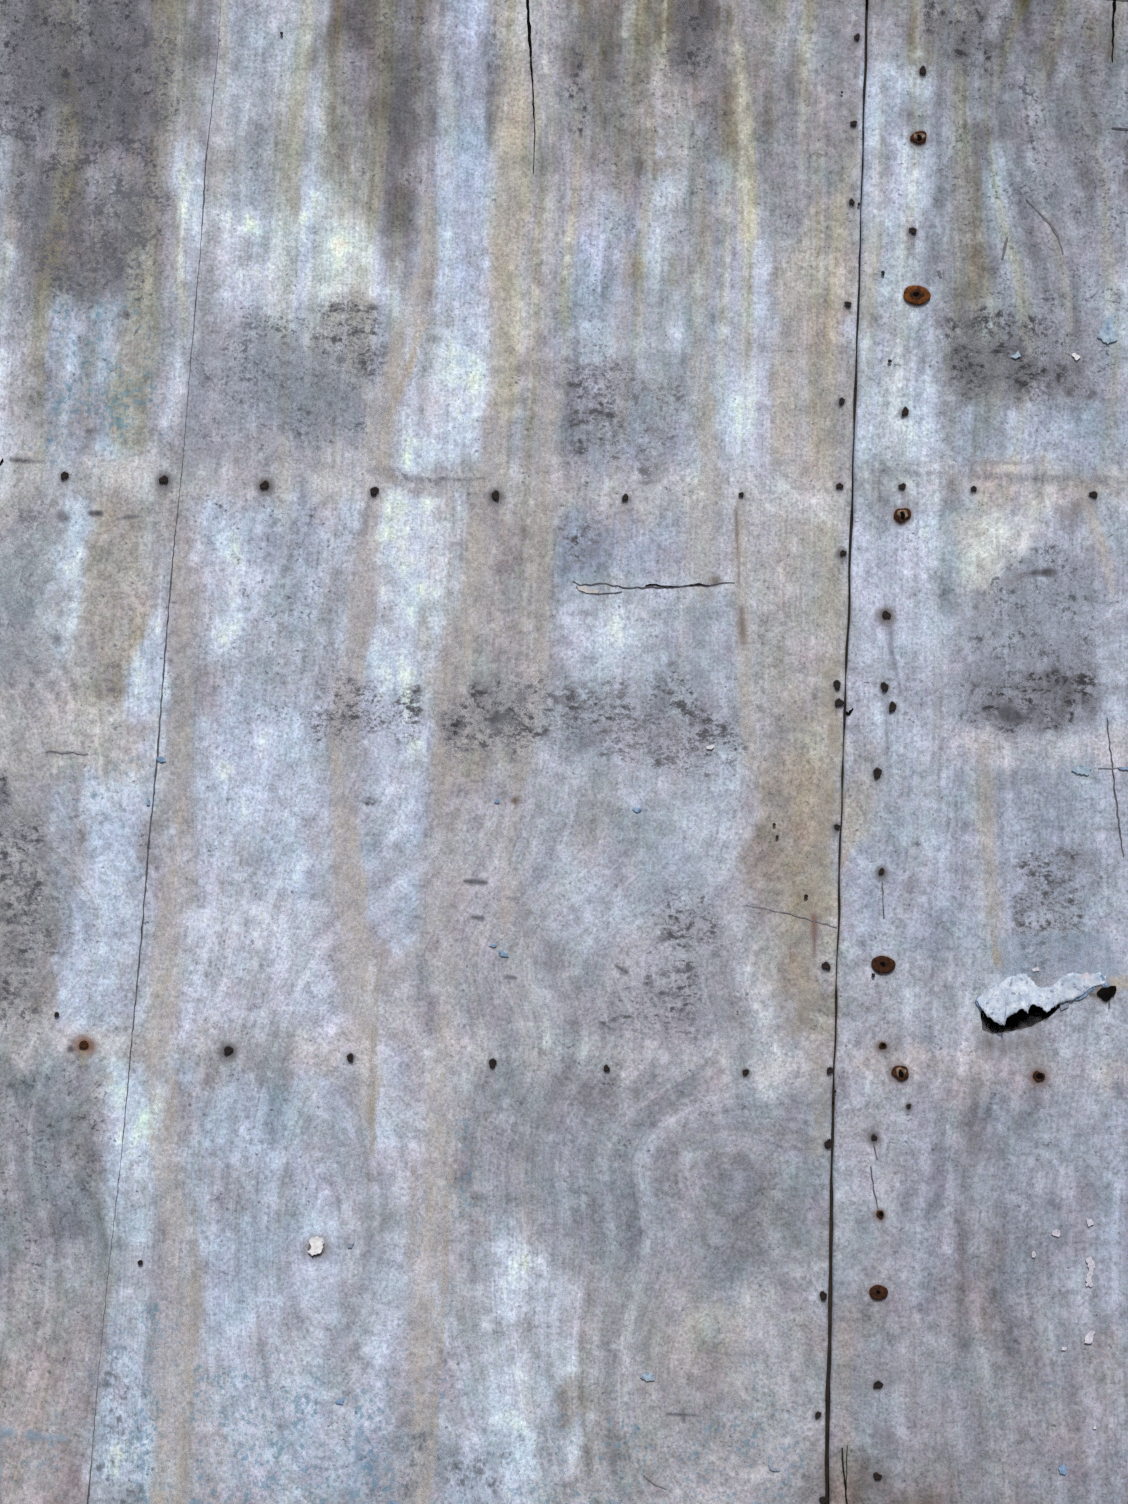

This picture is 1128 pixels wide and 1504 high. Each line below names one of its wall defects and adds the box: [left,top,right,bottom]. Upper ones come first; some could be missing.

damp [0,0,175,145]
crack [526,0,535,173]
damp [0,178,165,306]
damp [940,305,1097,402]
crack [573,581,735,595]
damp [956,506,1110,754]
damp [0,776,73,1001]
peeling [975,967,1128,1034]
crack [841,1445,849,1504]